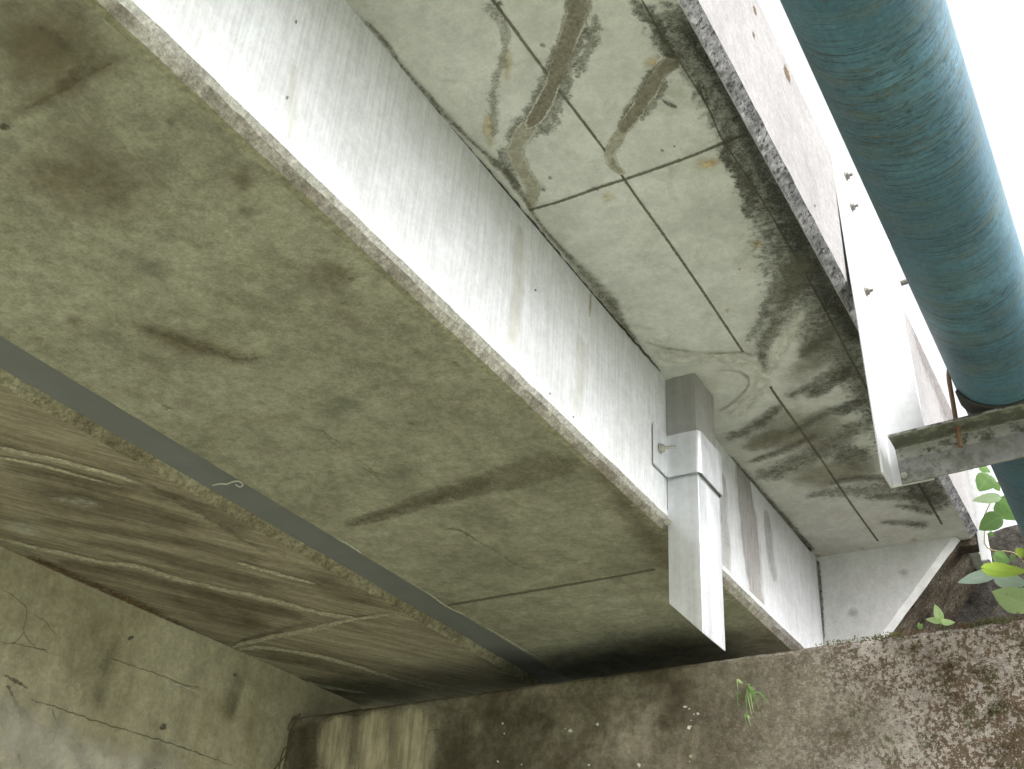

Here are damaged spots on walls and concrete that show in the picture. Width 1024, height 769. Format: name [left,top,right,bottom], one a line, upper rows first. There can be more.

damp [498,0,600,208]
damp [604,0,953,604]